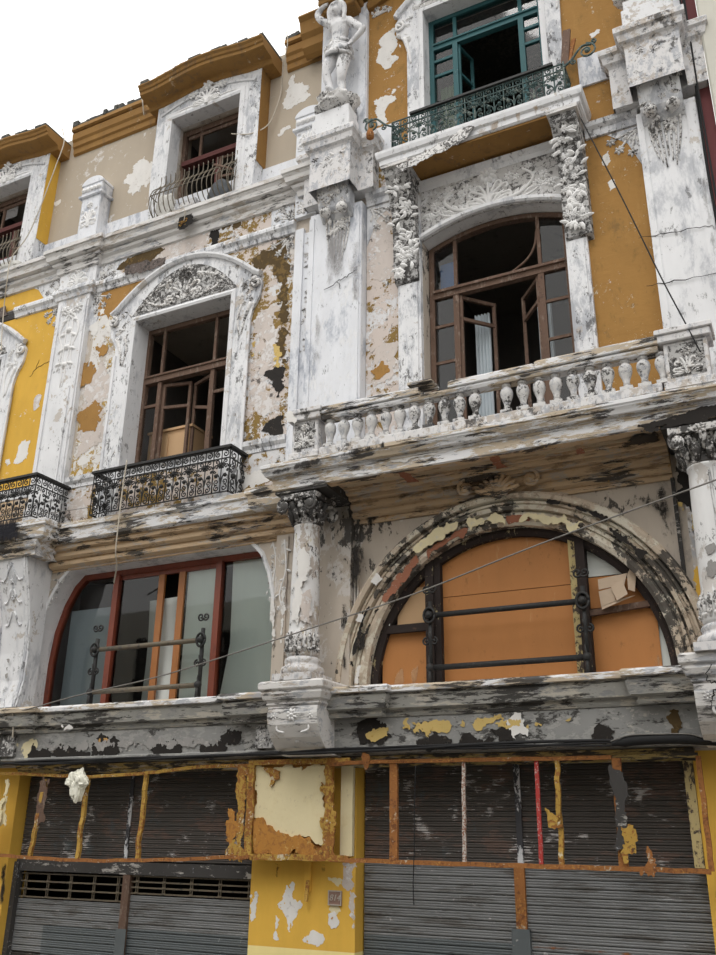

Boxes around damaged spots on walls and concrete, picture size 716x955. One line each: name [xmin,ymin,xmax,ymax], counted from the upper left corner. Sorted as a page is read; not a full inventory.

peeling [376,28,399,70]
peeling [282,74,311,110]
peeling [374,89,396,126]
peeling [75,247,166,459]
peeling [250,235,297,436]
peeling [350,499,647,684]
crack [705,664,716,707]
peeling [356,718,392,745]
peeling [403,712,542,752]
peeling [250,891,259,922]
peeling [273,881,303,940]
peeling [302,863,357,947]